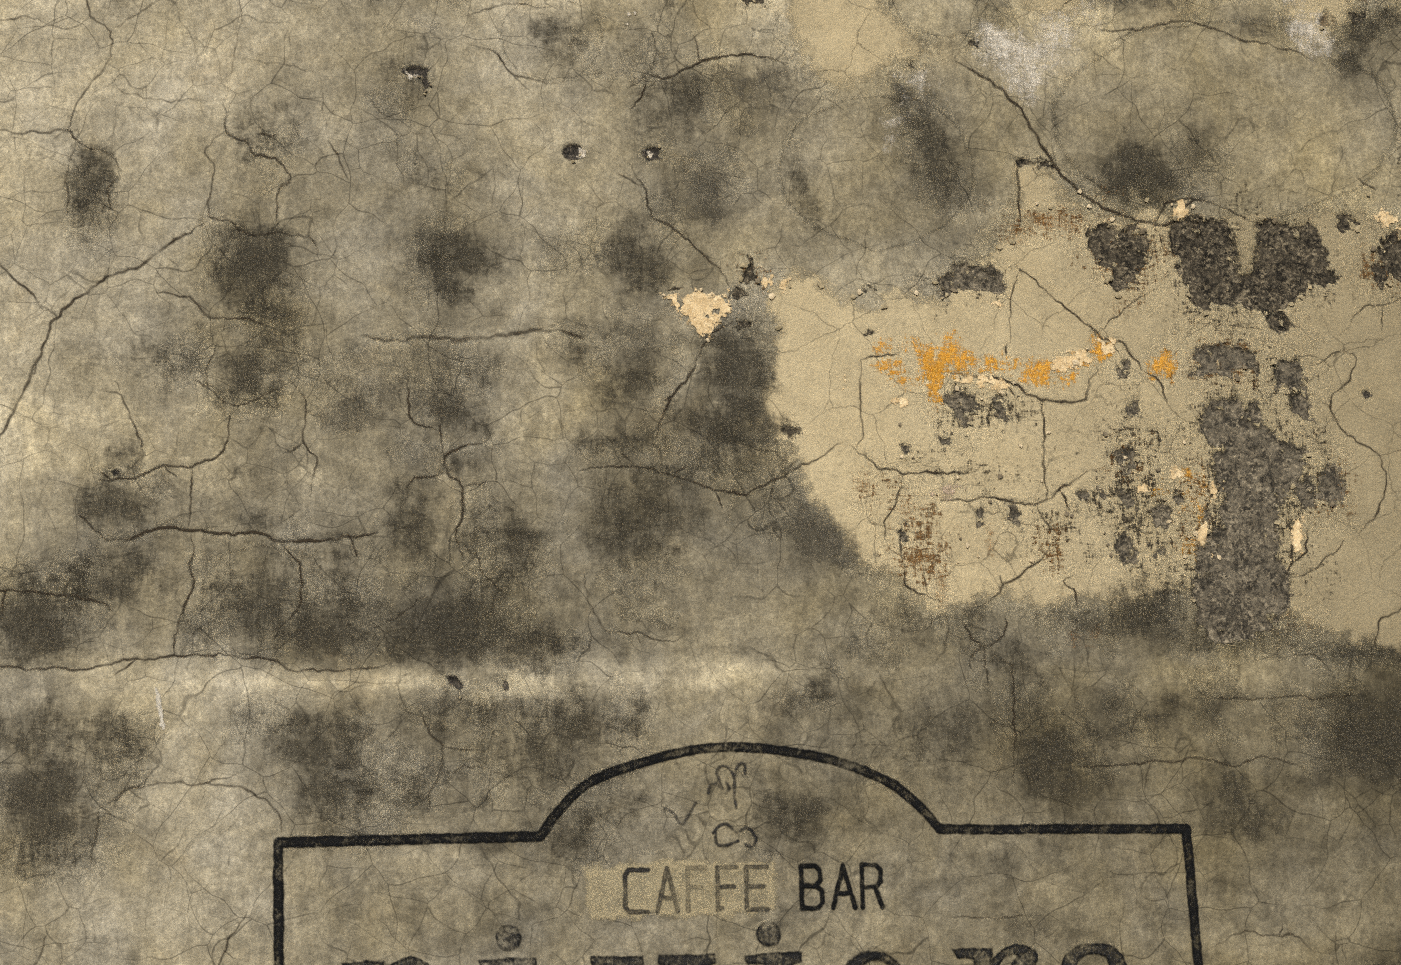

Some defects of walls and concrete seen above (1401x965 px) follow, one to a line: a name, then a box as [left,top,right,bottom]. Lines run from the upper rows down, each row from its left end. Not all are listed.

water stain [977,16,1071,97]
crack [967,67,1247,263]
crack [0,133,291,435]
rust [873,330,1113,405]
peeling [660,156,1401,652]
crack [1010,271,1166,398]
rust [1146,348,1178,383]
water stain [0,547,155,661]
crack [0,394,376,673]
water stain [210,506,580,671]
crack [859,346,1087,743]
water stain [0,699,146,877]